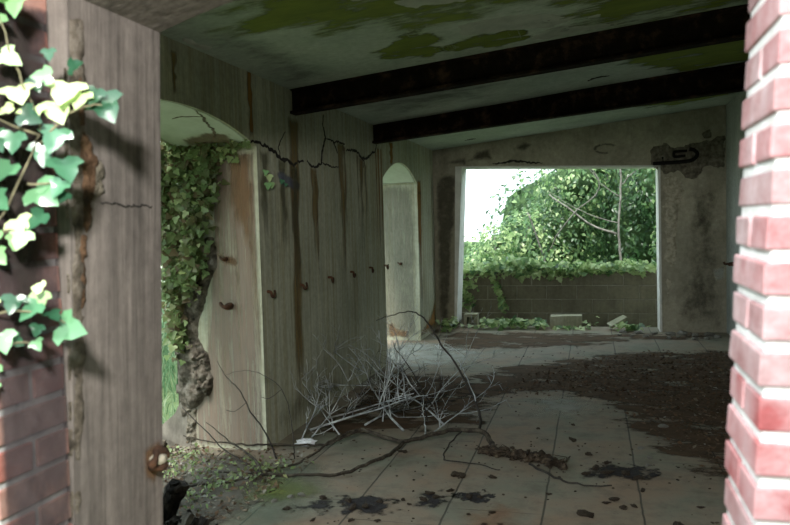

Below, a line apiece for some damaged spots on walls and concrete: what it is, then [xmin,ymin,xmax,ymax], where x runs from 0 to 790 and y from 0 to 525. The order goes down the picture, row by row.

spalling [64,18,86,93]
crack [172,110,229,145]
crack [250,115,377,179]
flaking render [650,129,726,179]
spalling [64,104,104,324]
crack [101,201,152,209]
spalling [162,237,217,448]
spalling [68,336,86,461]